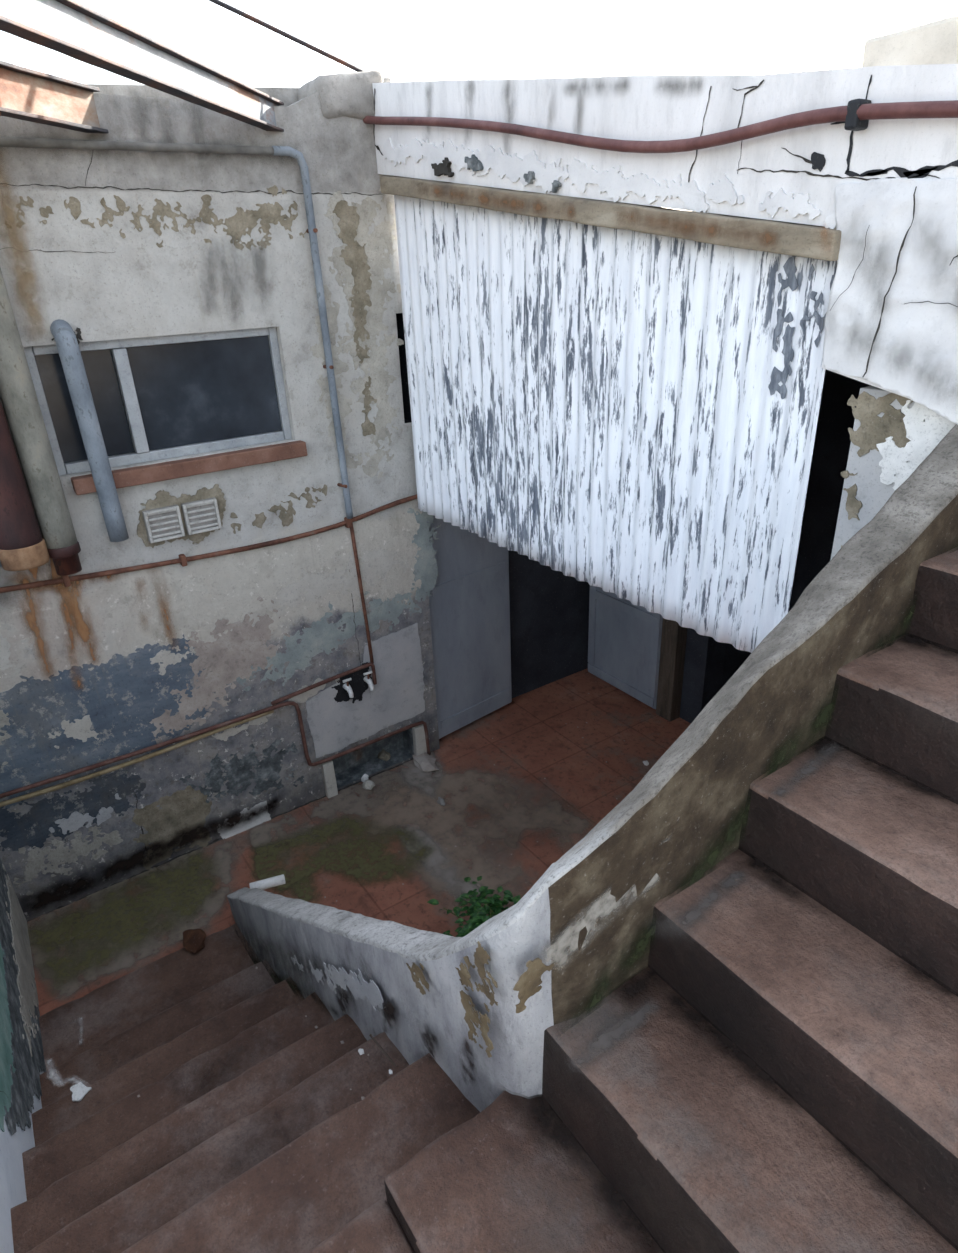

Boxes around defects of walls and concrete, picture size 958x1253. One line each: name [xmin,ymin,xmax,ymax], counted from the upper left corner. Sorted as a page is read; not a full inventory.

peeling [4,185,307,251]
crack [688,80,958,377]
flaking render [310,138,836,479]
peeling [847,391,956,490]
peeling [230,485,327,534]
peeling [841,470,863,520]
corrosion [20,558,113,674]
peeling [48,715,99,749]
peeling [406,962,429,995]
flaking render [421,1028,437,1059]
peeling [455,941,498,1081]
peeling [513,873,659,1013]